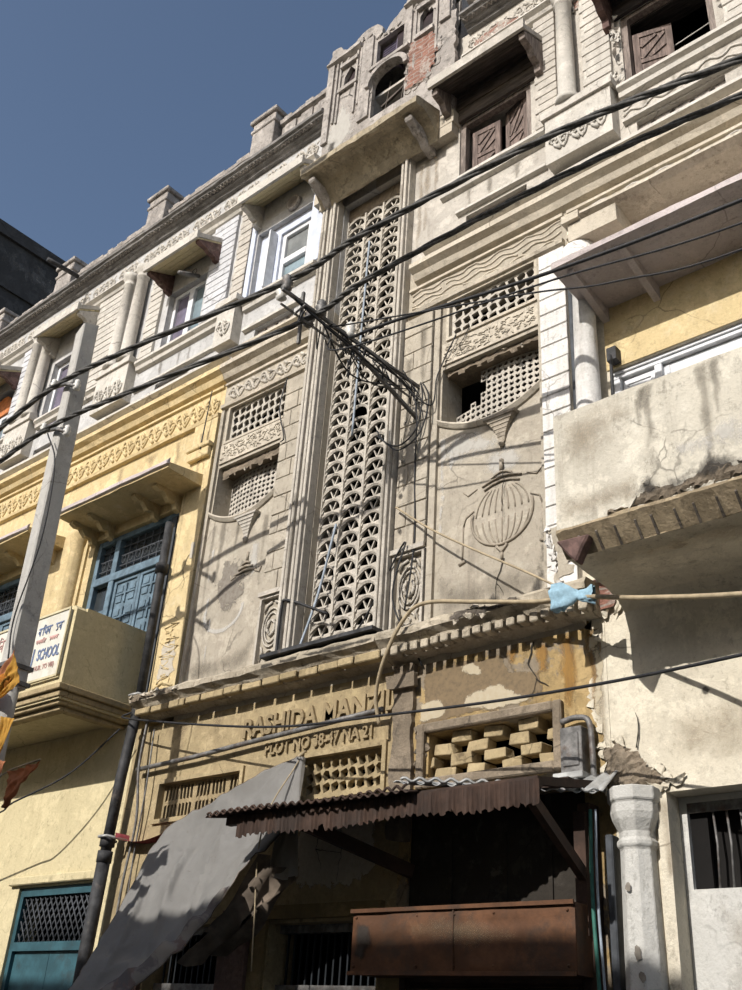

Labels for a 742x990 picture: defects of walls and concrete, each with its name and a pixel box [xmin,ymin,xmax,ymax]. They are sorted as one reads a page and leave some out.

spalling [404,27,442,95]
spalling [607,456,742,514]
crack [527,642,549,694]
spalling [582,579,686,796]
peeling [413,655,543,780]
peeling [295,831,375,889]
peeling [333,821,377,846]